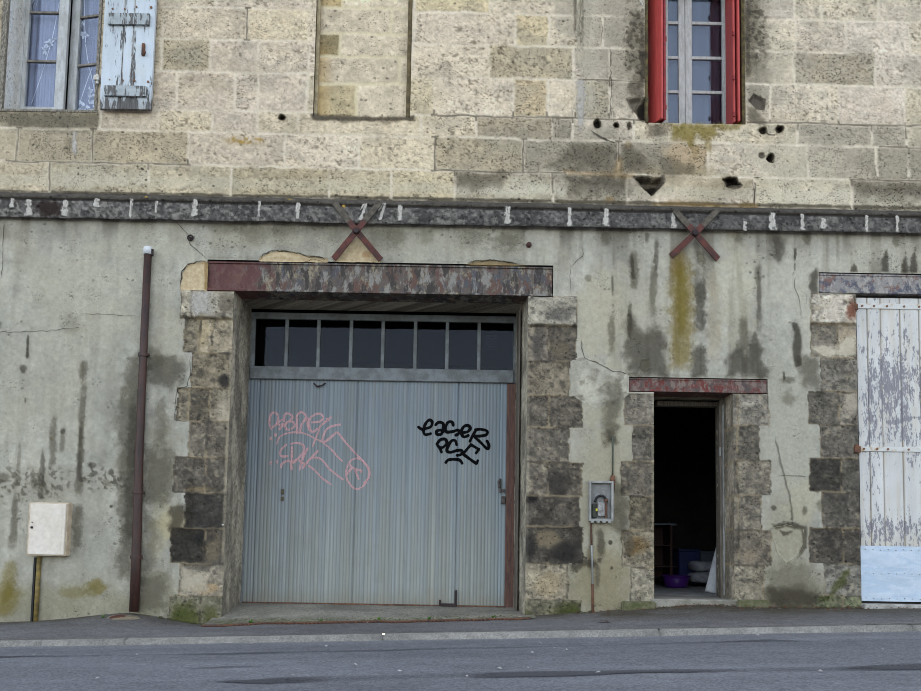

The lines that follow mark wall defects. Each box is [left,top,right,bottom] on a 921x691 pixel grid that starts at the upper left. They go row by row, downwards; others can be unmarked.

hole [633,175,665,196]
spalling [259,237,381,263]
spalling [180,261,208,291]
damp [809,270,818,293]
damp [697,284,705,325]
damp [627,319,667,376]
damp [694,349,705,375]
damp [731,339,767,378]
damp [169,505,185,533]